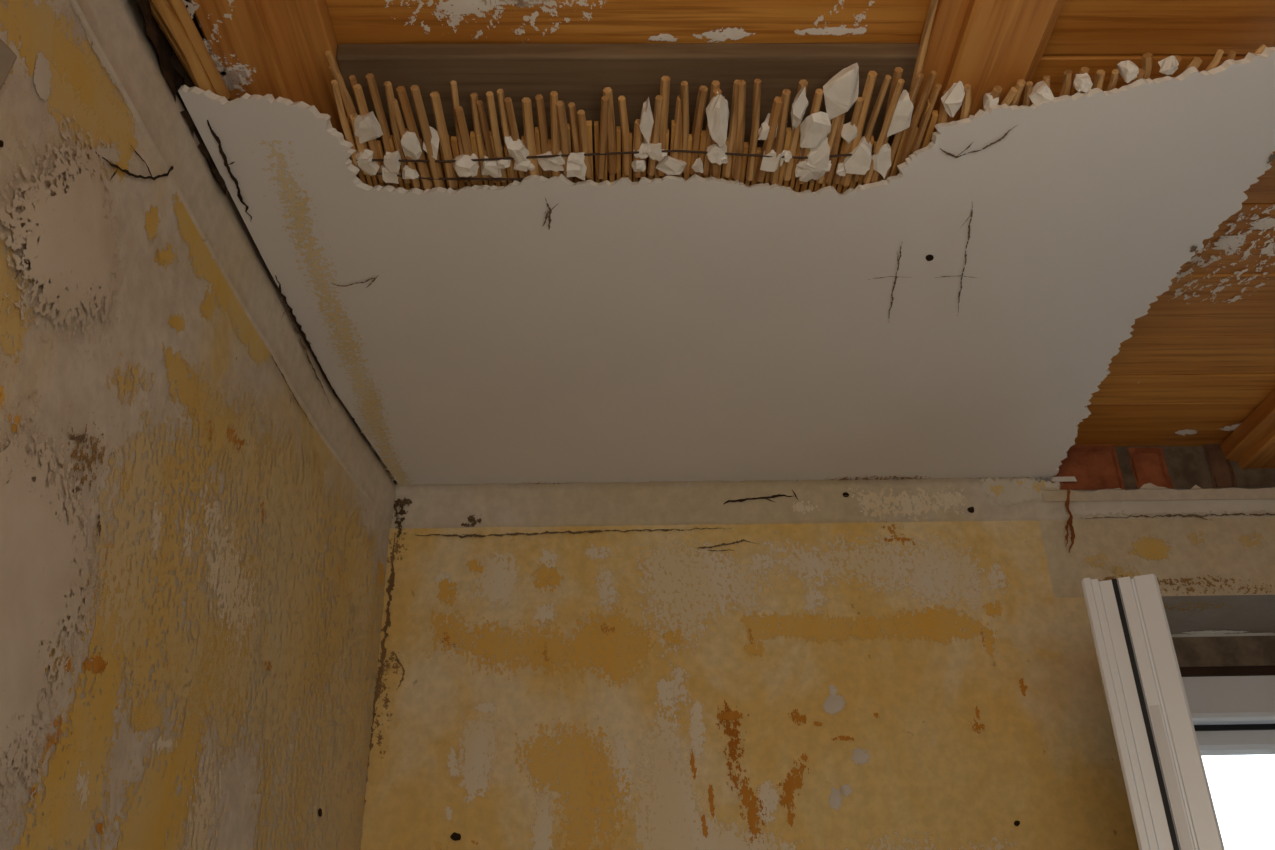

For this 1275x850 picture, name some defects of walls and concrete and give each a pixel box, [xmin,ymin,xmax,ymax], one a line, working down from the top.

peeling [0,0,144,181]
flaking render [137,0,227,195]
peeling [0,226,37,367]
peeling [142,192,273,370]
peeling [163,313,247,459]
peeling [8,545,189,850]
peeling [445,702,505,822]
peeling [530,789,554,850]
corrosion [701,700,809,843]
peeling [585,526,1020,850]